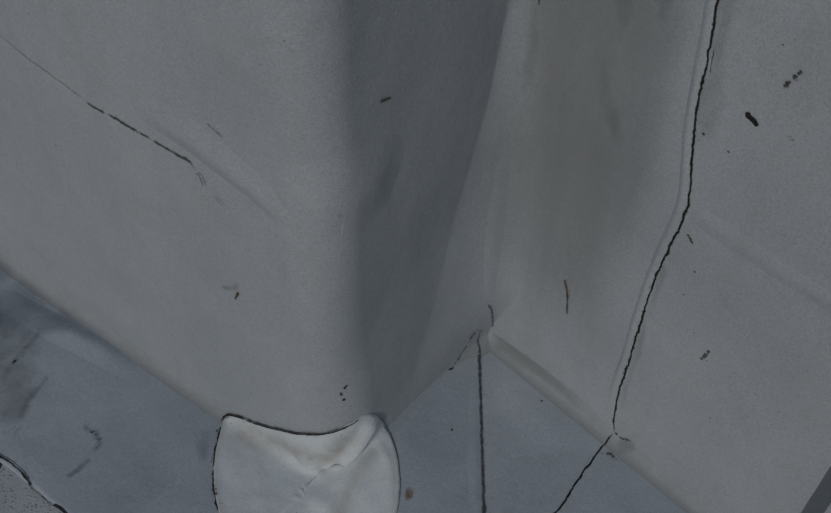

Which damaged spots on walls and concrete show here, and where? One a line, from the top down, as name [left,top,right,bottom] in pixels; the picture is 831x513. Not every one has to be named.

crack [62,83,203,185]
crack [554,0,719,513]
crack [468,338,486,513]